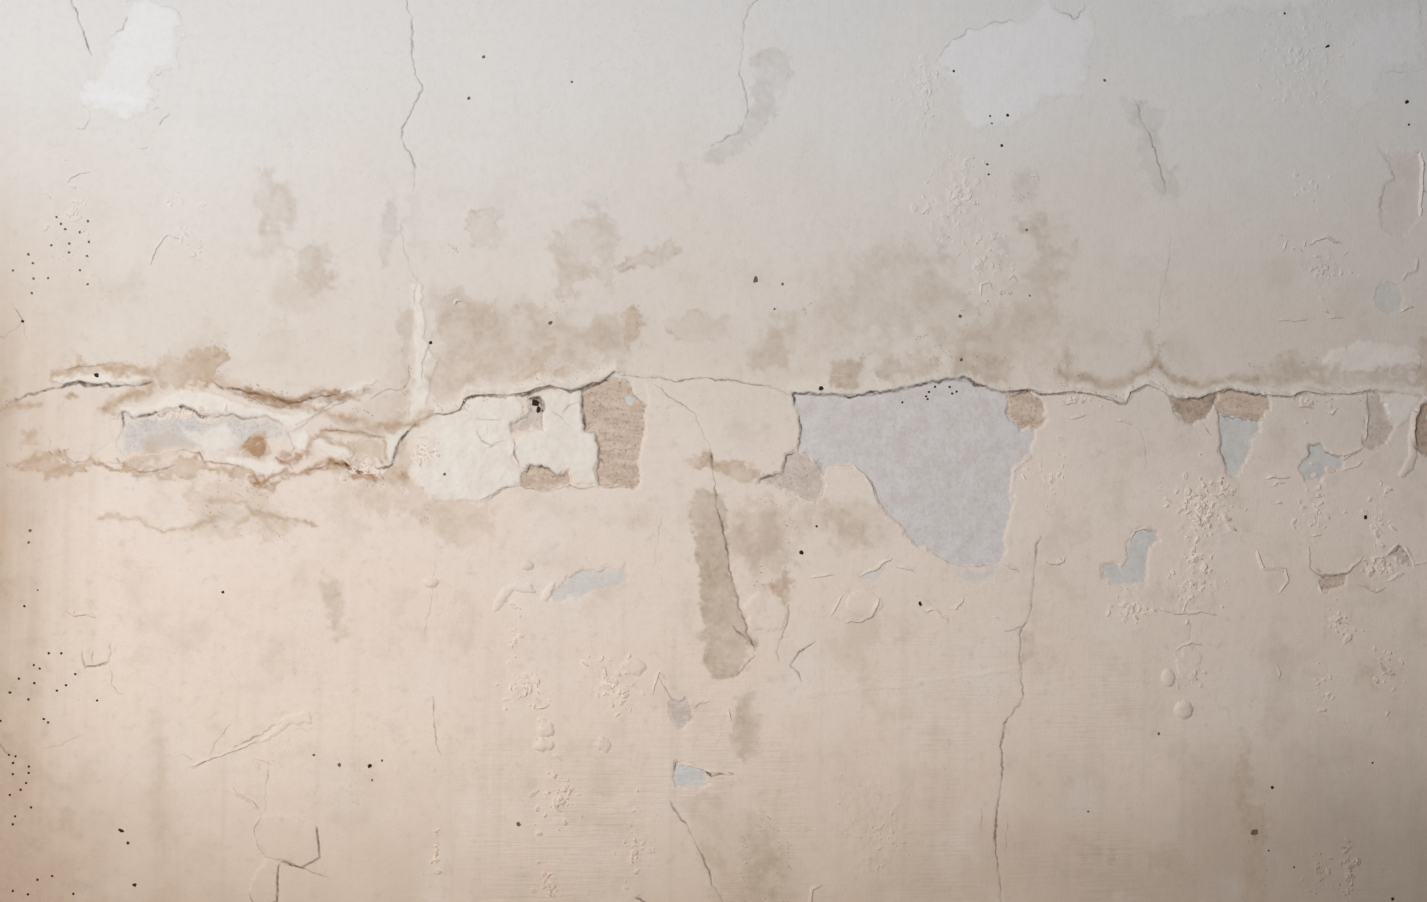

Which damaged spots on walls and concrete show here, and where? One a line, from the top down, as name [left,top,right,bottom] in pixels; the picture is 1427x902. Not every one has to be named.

spalling [80,86,155,108]
crack [44,380,147,391]
damp [0,161,1427,552]
spalling [117,403,288,461]
peeling [341,456,387,481]
spalling [510,358,1105,568]
spalling [1168,388,1338,478]
spalling [1298,389,1427,483]
spalling [550,563,629,604]
spalling [1101,526,1162,587]
peeling [1308,533,1427,594]
damp [673,449,889,902]